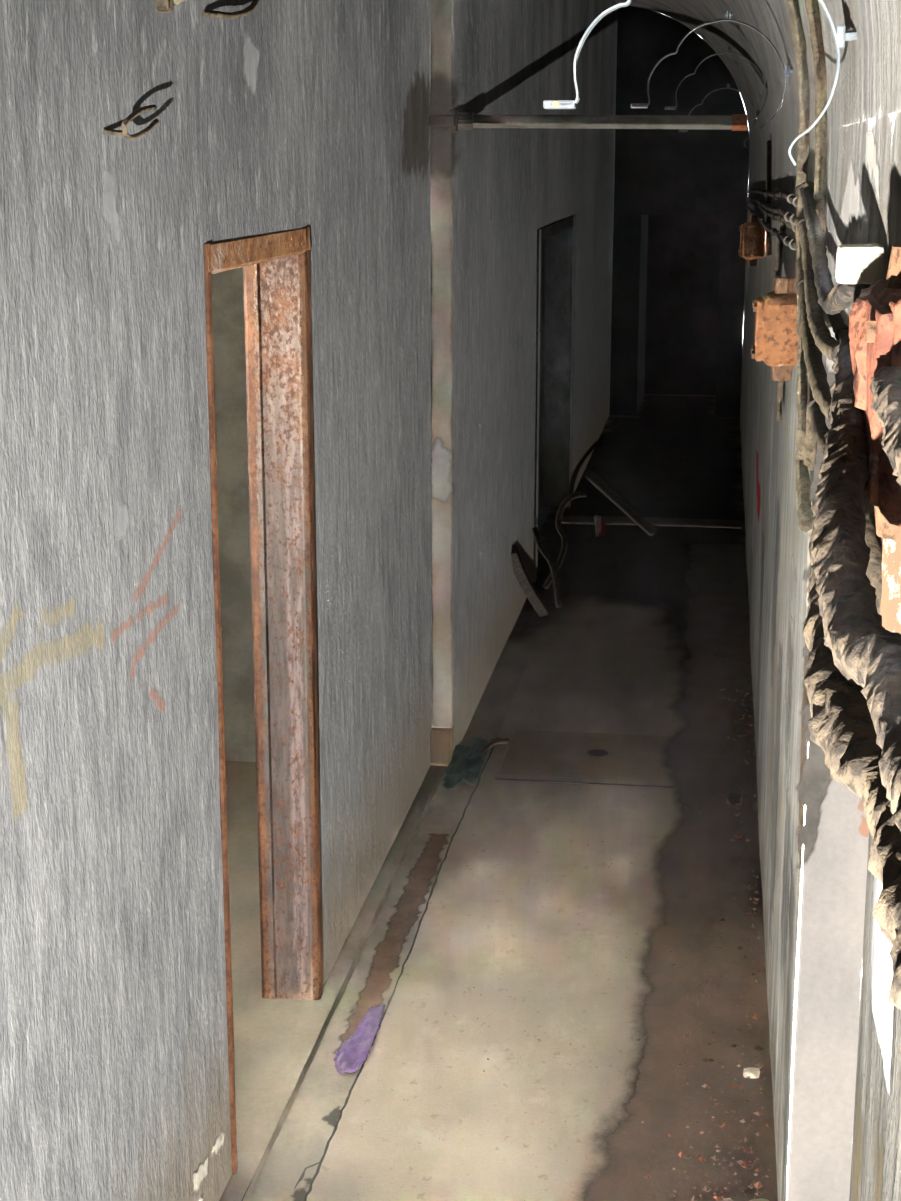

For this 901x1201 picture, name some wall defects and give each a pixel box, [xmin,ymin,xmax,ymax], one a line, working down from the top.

flaking render [824,367,835,387]
flaking render [803,450,823,617]
flaking render [796,647,832,868]
crack [294,737,498,1201]
peeling [871,876,893,1093]